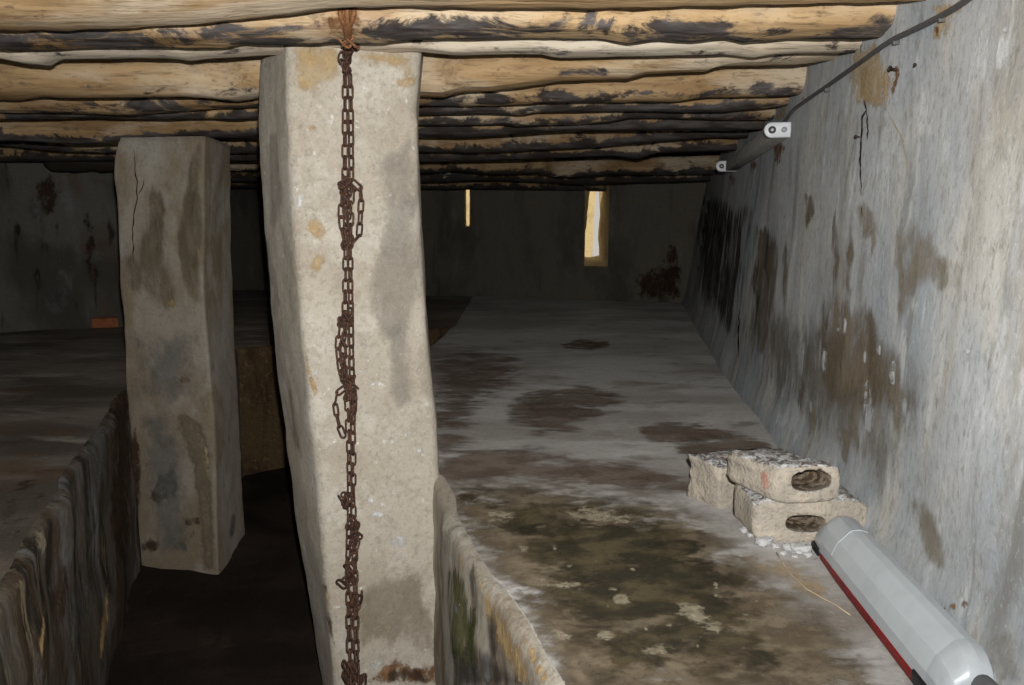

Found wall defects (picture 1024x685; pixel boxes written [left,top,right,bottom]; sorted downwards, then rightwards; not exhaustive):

crack [859,92,907,216]
crack [132,156,144,290]
leakage [128,196,172,306]
leakage [179,158,201,297]
leakage [562,339,609,350]
rust [637,245,680,298]
leakage [696,195,943,471]
leakage [432,353,872,685]